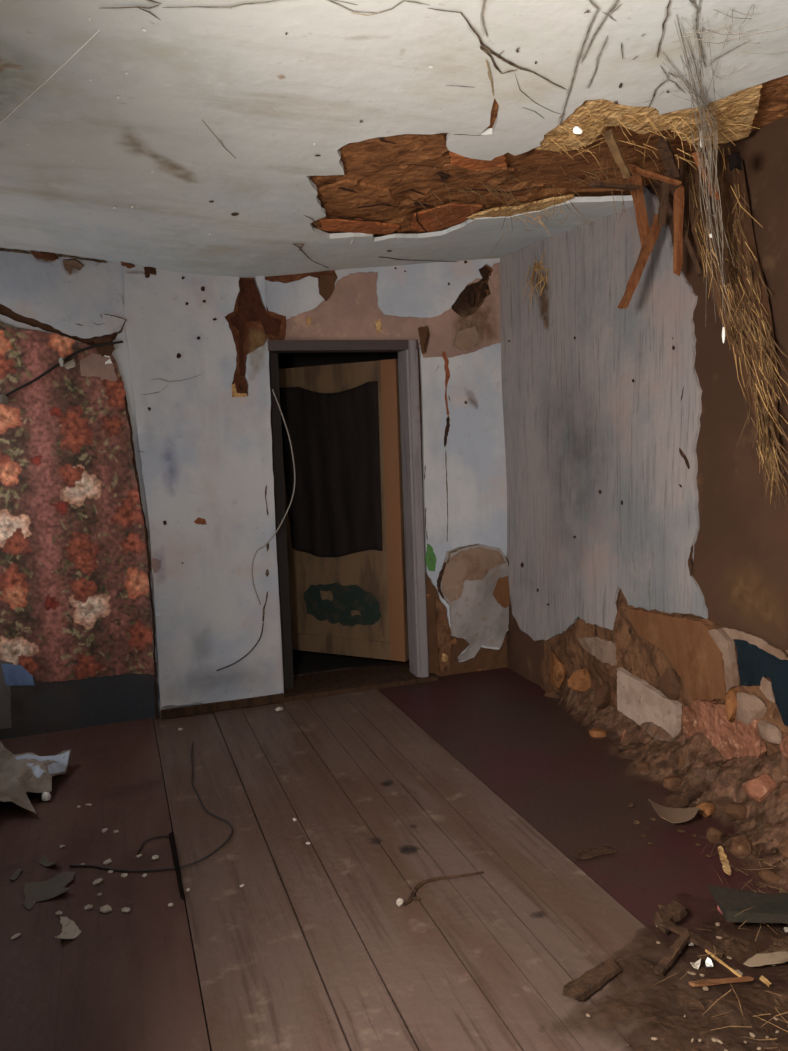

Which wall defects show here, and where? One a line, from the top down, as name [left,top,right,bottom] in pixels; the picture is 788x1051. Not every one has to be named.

crack [114,0,278,20]
crack [328,0,748,125]
flaking render [30,250,85,275]
flaking render [213,72,788,397]
flaking render [425,543,507,677]
peeling [722,628,788,726]